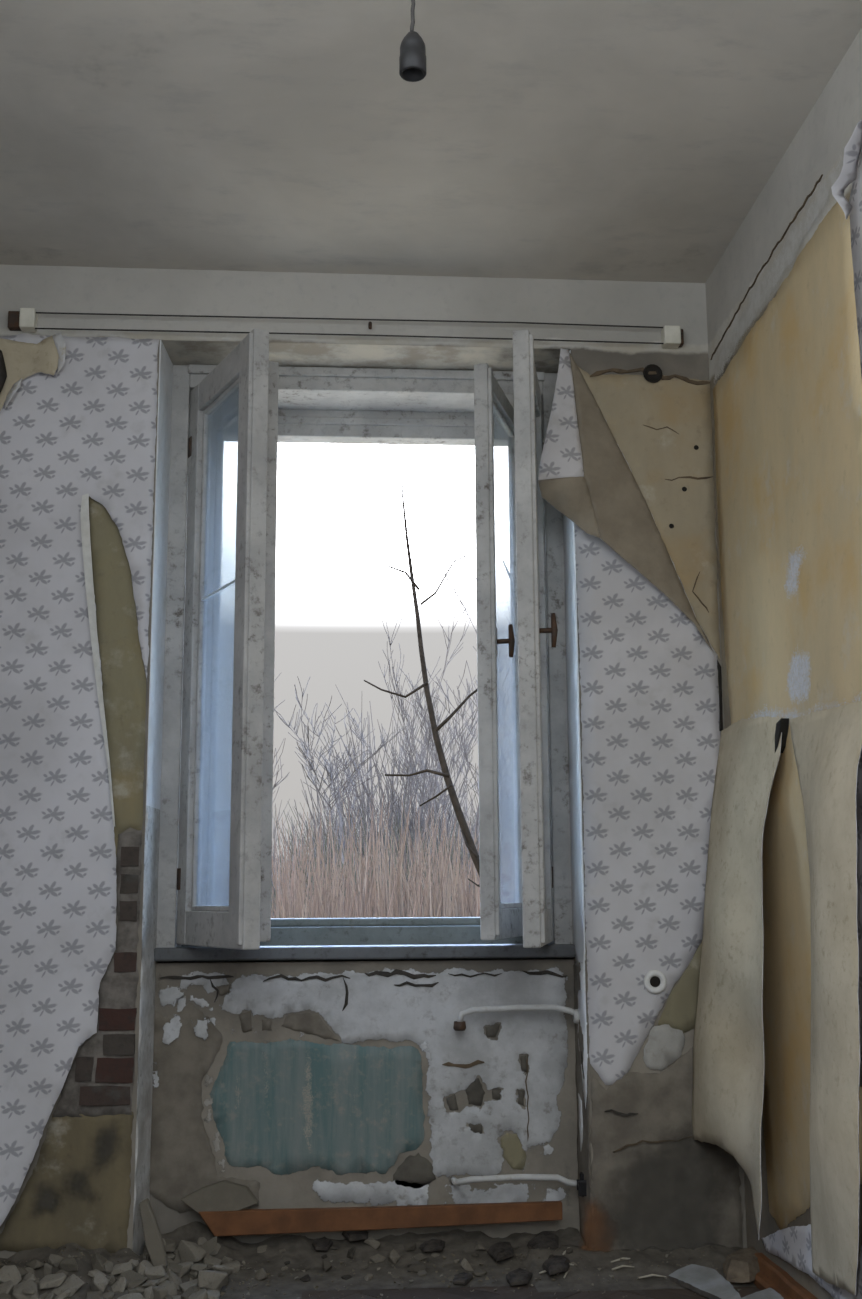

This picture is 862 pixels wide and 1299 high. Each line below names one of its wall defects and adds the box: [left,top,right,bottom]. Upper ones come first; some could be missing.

crack [590,174,823,385]
peeling [0,497,743,1255]
peeling [569,202,862,1230]